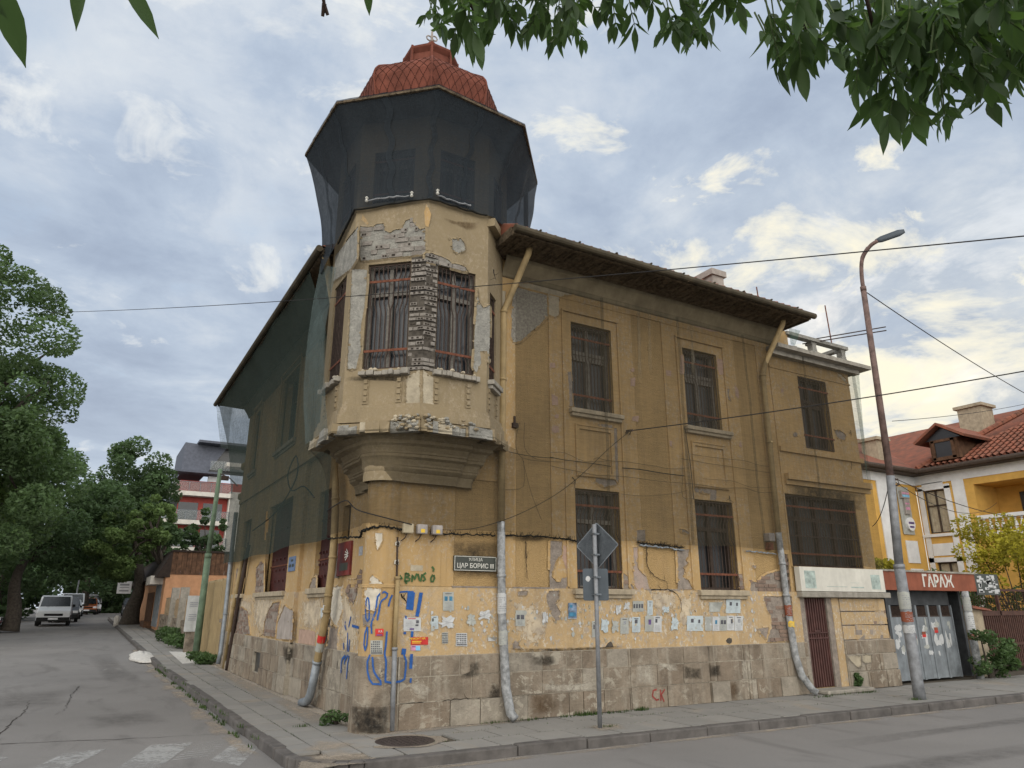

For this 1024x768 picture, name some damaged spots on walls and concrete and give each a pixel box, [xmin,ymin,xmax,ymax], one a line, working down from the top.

flaking render [332,204,469,404]
peeling [471,288,492,372]
peeling [509,283,574,344]
peeling [228,561,383,651]
peeling [510,539,571,650]
peeling [622,527,696,629]
crack [646,547,682,610]
flaking render [738,552,794,643]